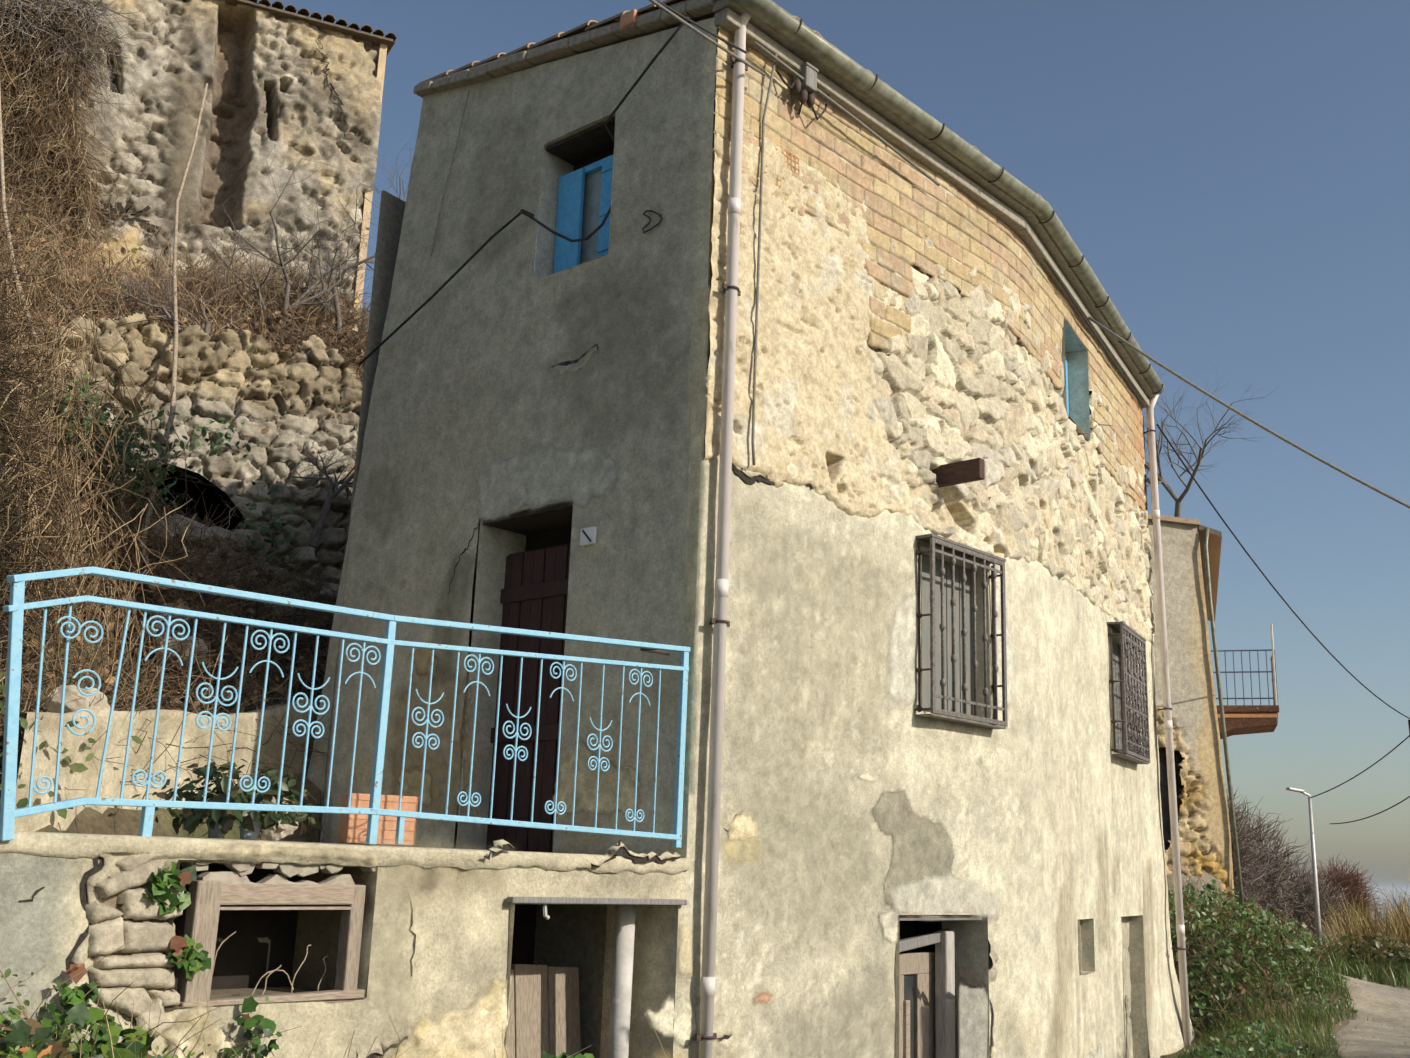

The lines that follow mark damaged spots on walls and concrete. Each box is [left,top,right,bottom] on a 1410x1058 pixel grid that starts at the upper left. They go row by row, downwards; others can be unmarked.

spalling [729,813,758,840]
flaking render [85,843,376,1058]
peeling [391,979,509,1058]
crack [987,990,995,1058]